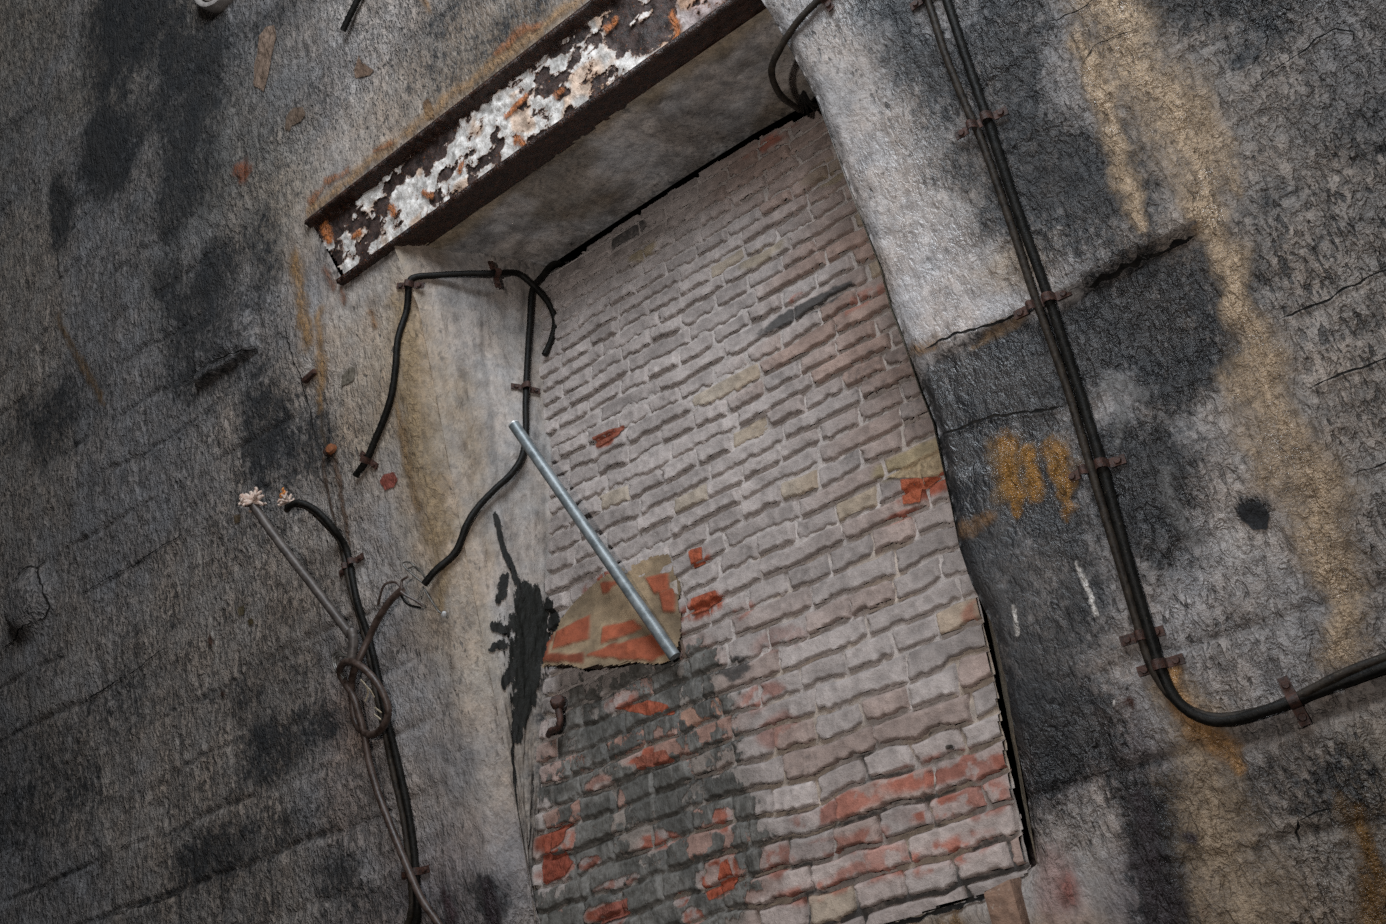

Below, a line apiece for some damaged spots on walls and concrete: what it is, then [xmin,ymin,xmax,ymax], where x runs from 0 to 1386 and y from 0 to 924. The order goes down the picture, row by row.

rust [668,9,680,38]
crack [1254,22,1355,84]
rust [307,0,579,244]
crack [1089,234,1196,288]
crack [1282,269,1386,318]
crack [925,309,1031,349]
leakage [1068,0,1359,661]
crack [1311,357,1386,388]
spalling [688,547,706,568]
leakage [1011,605,1020,636]
peeling [533,554,777,924]
leakage [1154,666,1270,924]